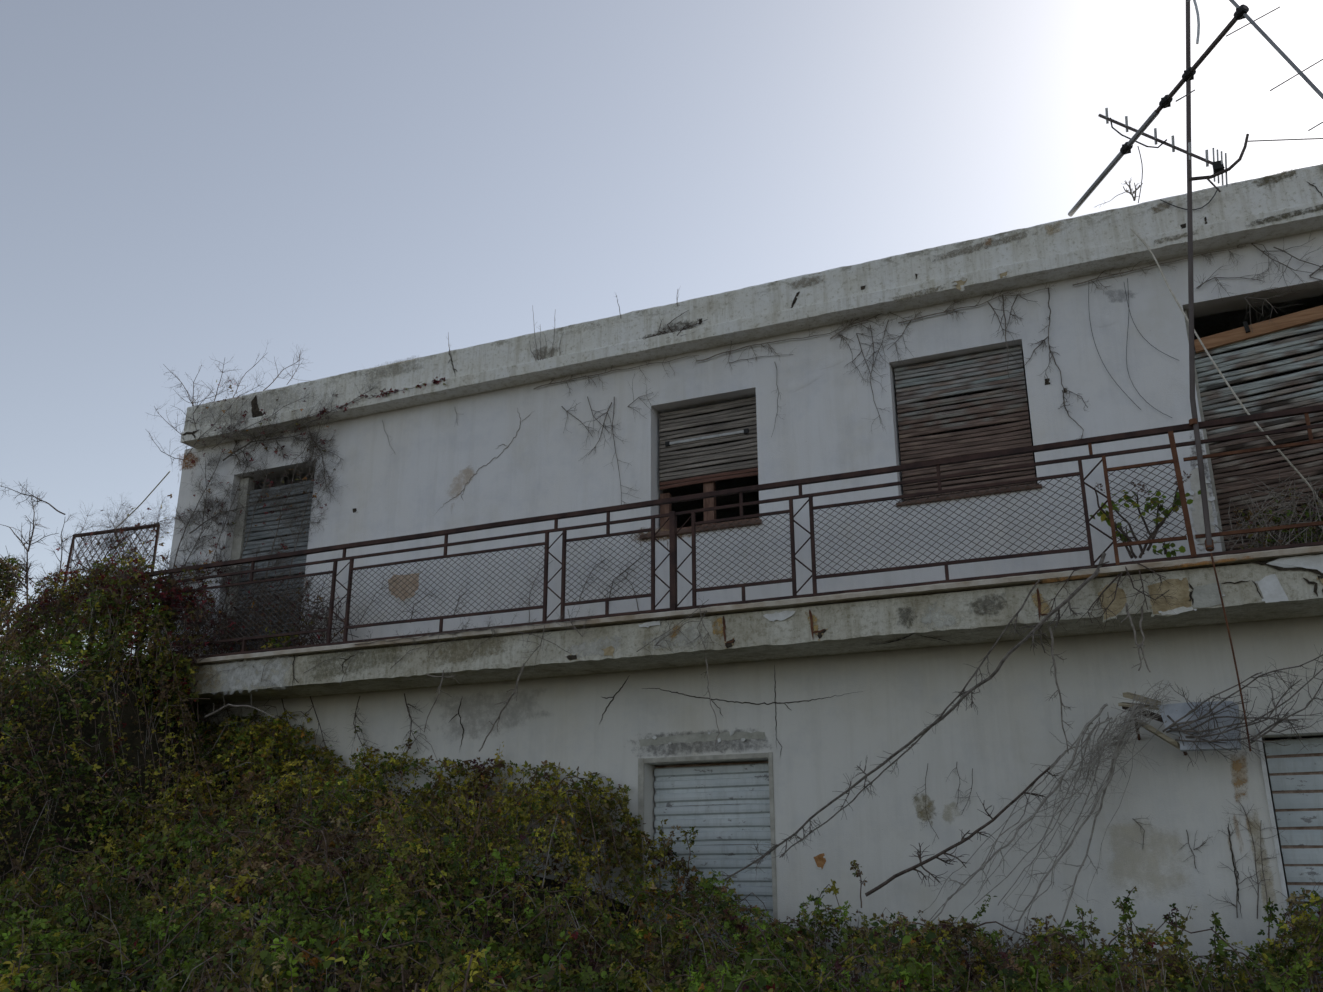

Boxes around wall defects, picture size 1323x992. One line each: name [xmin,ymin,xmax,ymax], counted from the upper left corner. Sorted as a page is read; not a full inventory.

crack [433,408,534,516]
spalling [1095,581,1129,622]
spalling [1146,576,1197,617]
peeling [1255,574,1289,603]
spalling [812,852,828,870]